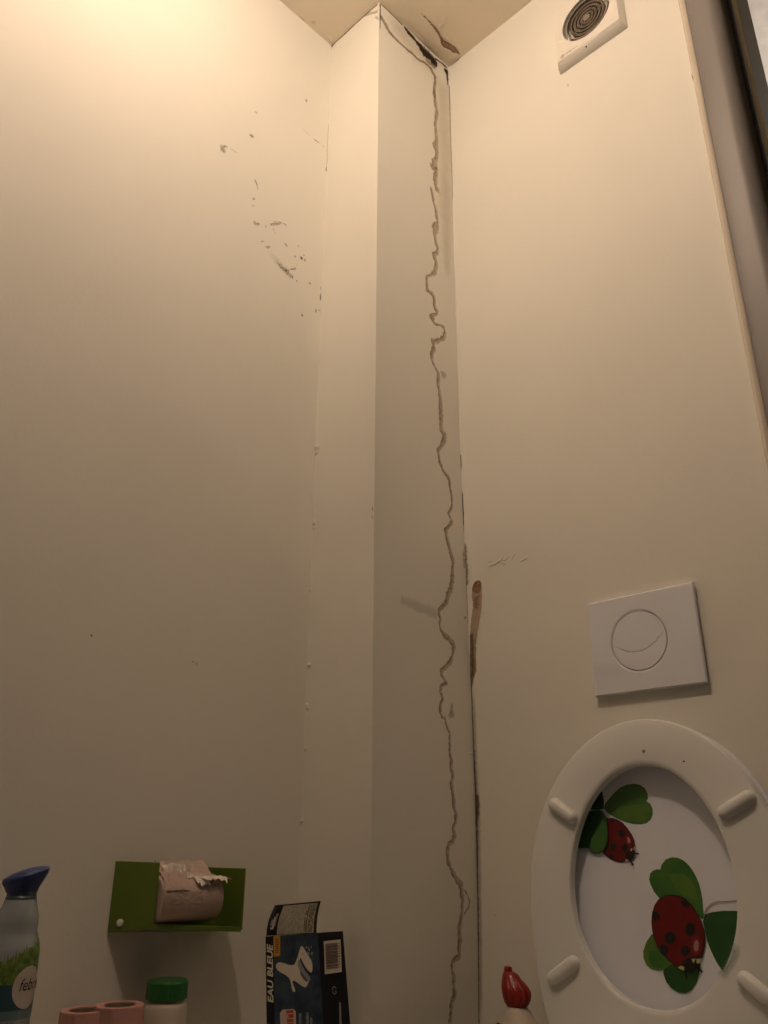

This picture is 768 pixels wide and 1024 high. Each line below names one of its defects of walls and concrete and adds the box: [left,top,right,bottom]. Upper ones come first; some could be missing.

peeling [407,12,460,65]
crack [471,690,480,1013]